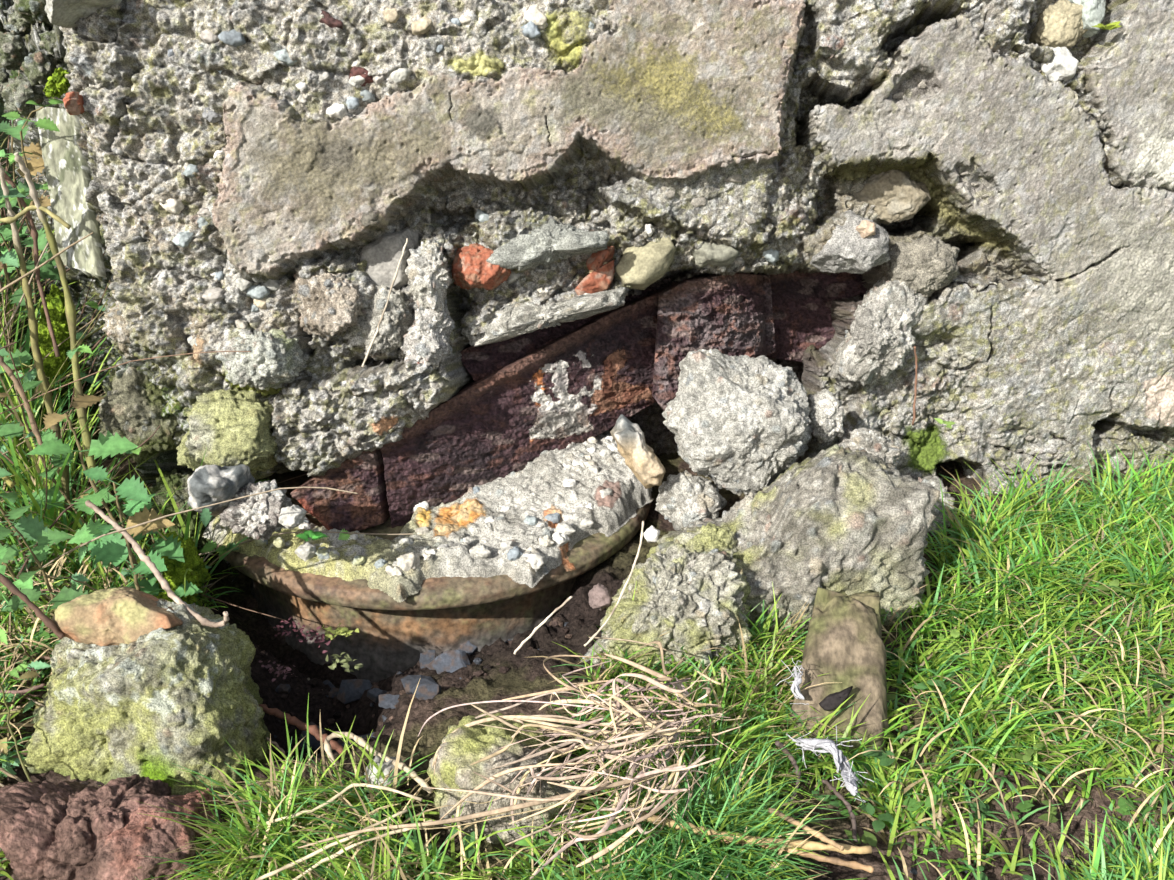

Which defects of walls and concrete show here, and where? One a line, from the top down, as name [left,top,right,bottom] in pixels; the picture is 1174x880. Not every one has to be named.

spalling [80,0,1129,407]
rust [530,363,549,442]
rust [590,349,652,416]
spalling [628,402,678,455]
rust [415,499,485,536]
rust [544,506,562,528]
rust [594,480,621,508]